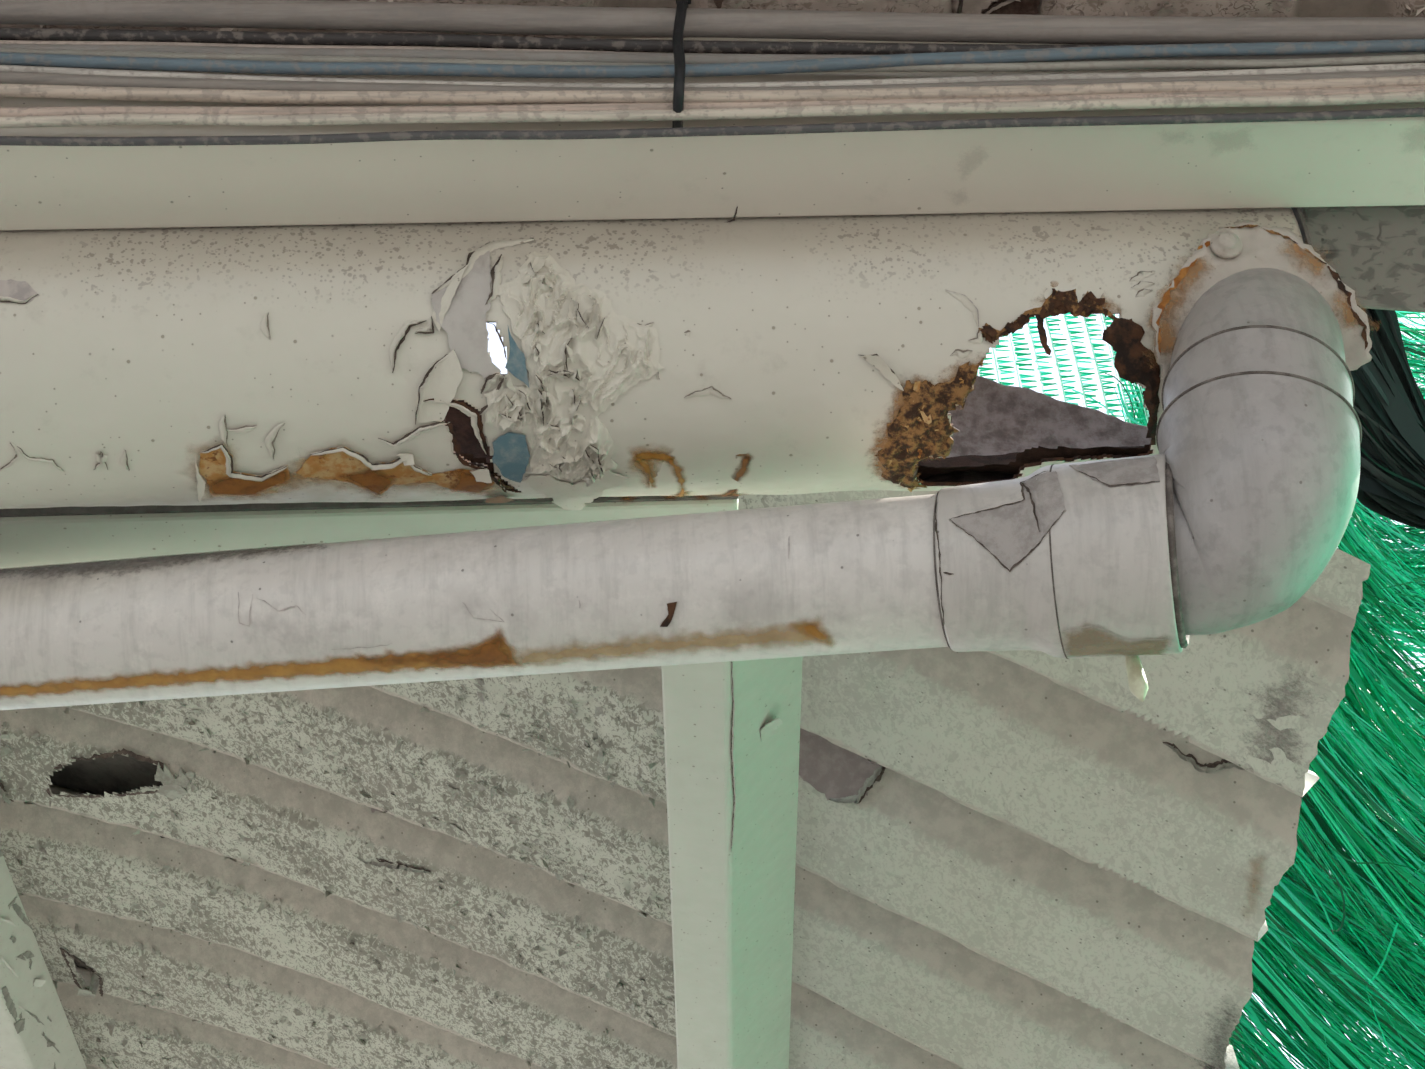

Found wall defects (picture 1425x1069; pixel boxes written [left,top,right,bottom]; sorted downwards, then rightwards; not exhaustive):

corrosion [1150,241,1210,358]
corrosion [1225,224,1368,349]
peeling [483,251,664,511]
corrosion [871,286,1121,490]
corrosion [195,444,515,505]
corrosion [633,451,751,499]
peeling [949,456,1160,572]
corrosion [0,624,831,697]
peeling [799,728,886,804]
crack [1163,742,1245,774]
peeling [0,897,60,1069]